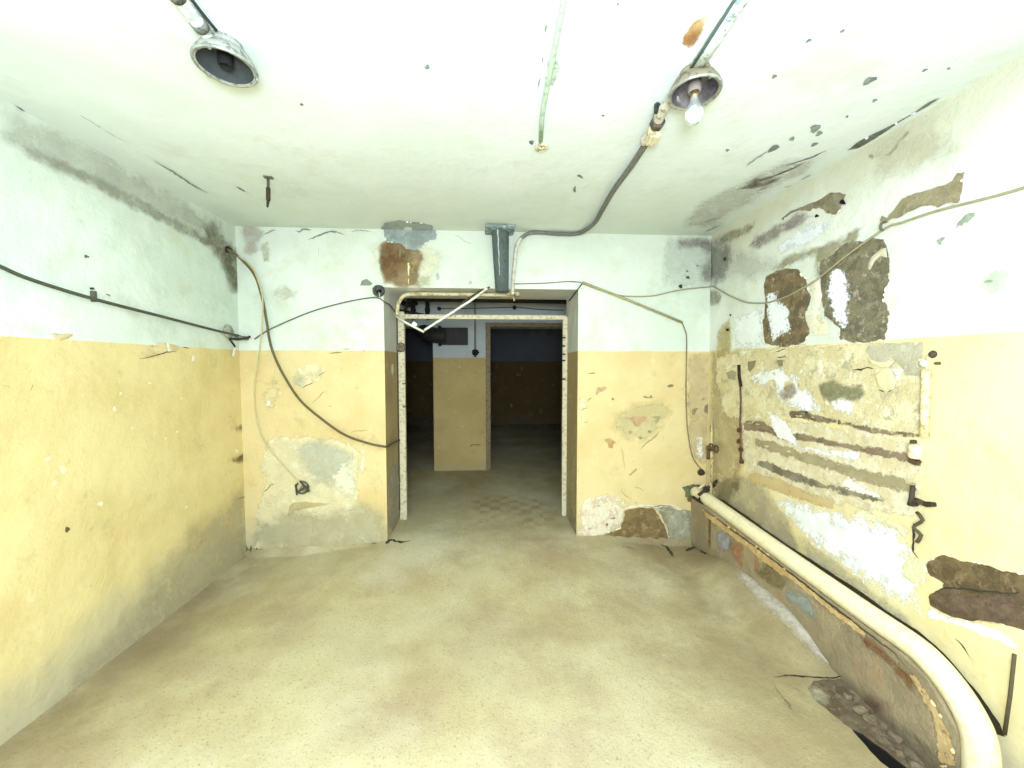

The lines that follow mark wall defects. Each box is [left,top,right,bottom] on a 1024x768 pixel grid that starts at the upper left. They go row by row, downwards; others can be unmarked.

damp [11,130,217,243]
spalling [381,220,437,250]
damp [691,165,803,225]
spalling [781,192,846,221]
spalling [879,171,965,222]
peeling [714,238,931,537]
peeling [254,434,383,549]
spalling [606,484,865,638]
spalling [901,555,1024,632]
crack [775,675,841,711]